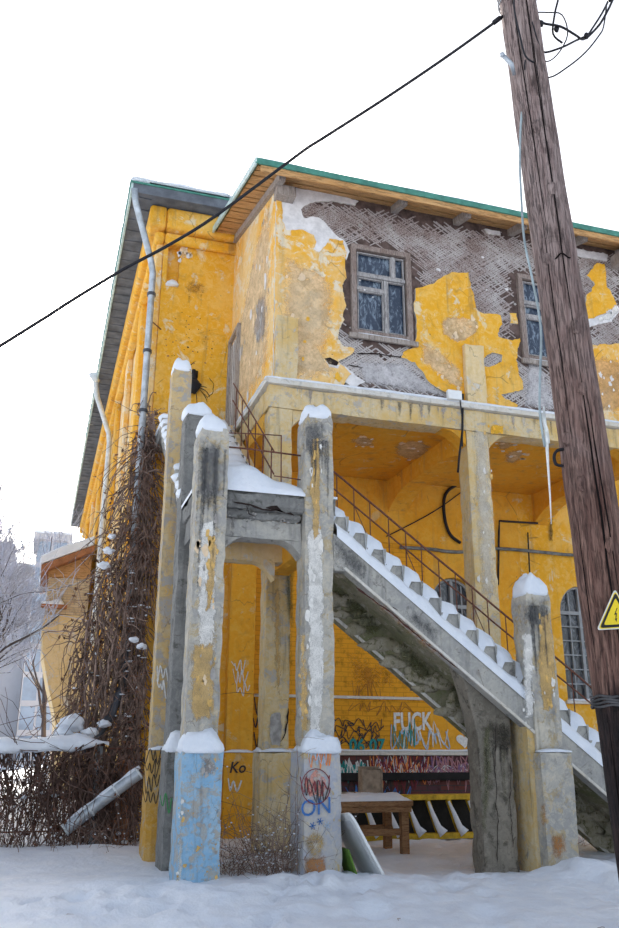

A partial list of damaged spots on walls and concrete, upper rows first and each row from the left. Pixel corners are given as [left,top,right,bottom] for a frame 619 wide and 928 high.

flaking render [239,188,554,412]
flaking render [576,244,619,346]
peeling [595,357,619,412]
leakage [197,448,226,562]
leakage [311,440,329,496]
peeling [476,425,529,592]
peeling [190,509,301,721]
spalling [270,438,464,746]
leakage [530,606,548,662]
spalling [575,794,615,853]